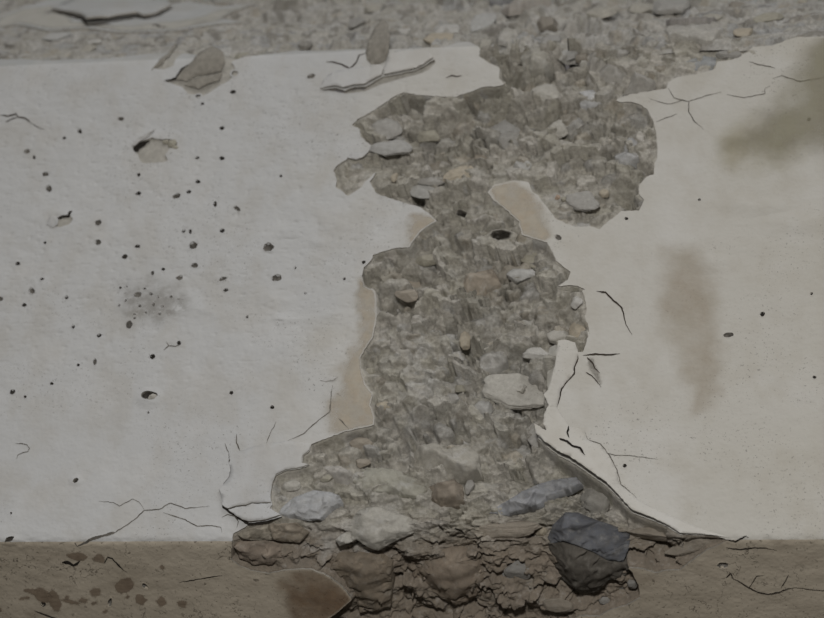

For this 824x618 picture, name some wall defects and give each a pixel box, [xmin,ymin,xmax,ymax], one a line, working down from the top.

spalling [0,0,824,97]
crack [651,62,809,130]
water stain [761,44,824,147]
peeling [131,130,178,163]
spalling [219,38,732,618]
crack [597,291,632,334]
crack [557,353,620,406]
crack [62,499,268,567]
crack [728,536,777,551]
crack [726,573,824,595]